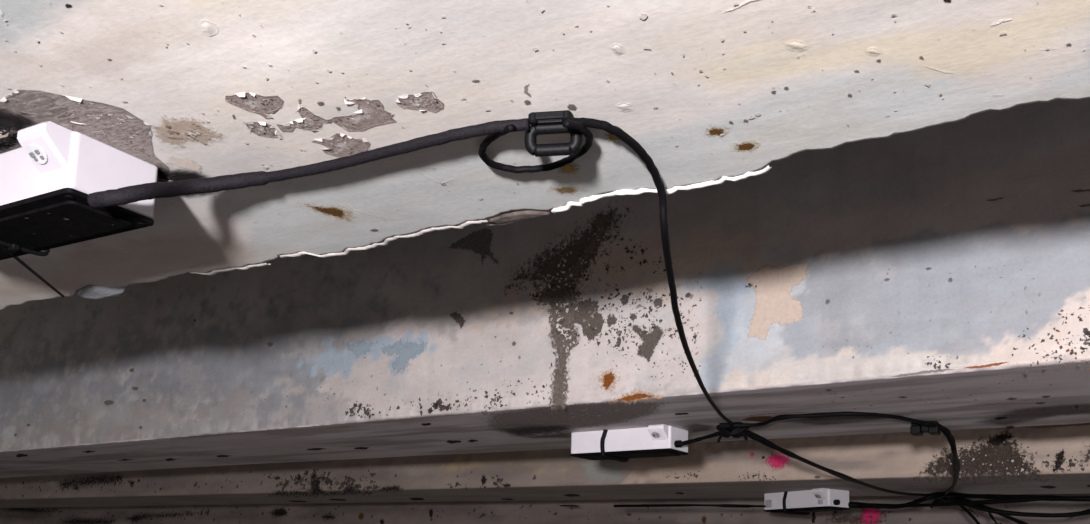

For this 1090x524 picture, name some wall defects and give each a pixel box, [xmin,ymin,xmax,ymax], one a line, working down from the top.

spalling [0,90,222,180]
peeling [225,92,444,157]
corrosion [305,204,351,221]
water stain [345,200,718,420]
peeling [745,261,808,340]
corrosion [600,371,661,402]